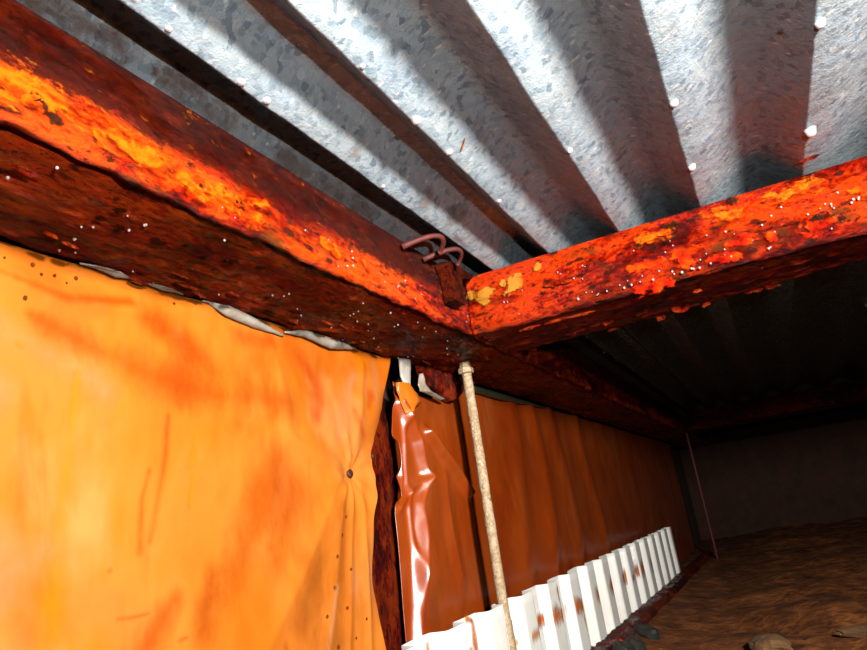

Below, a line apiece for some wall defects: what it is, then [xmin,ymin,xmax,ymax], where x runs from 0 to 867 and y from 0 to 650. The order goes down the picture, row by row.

corrosion [39,230,79,249]
corrosion [172,272,206,299]
corrosion [744,283,779,294]
corrosion [635,304,690,322]
corrosion [532,587,564,639]